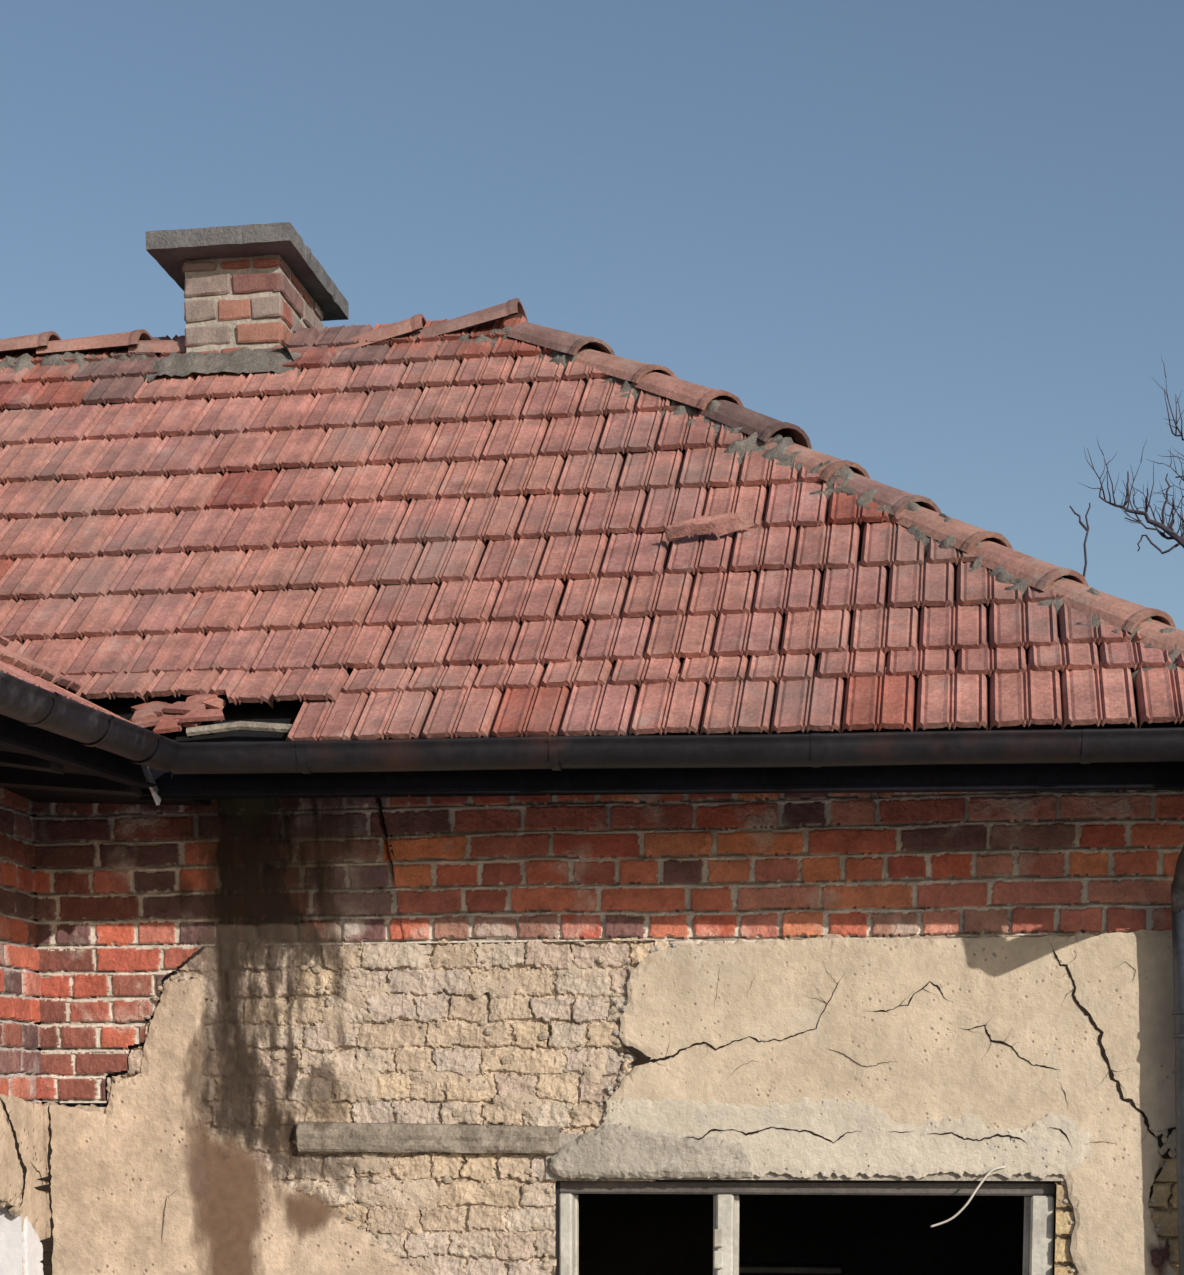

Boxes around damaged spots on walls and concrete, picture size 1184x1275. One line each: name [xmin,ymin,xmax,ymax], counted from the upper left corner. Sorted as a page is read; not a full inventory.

crack [0,1098,54,1275]
spalling [80,1015,152,1114]
water stain [191,797,325,1275]
water stain [286,1192,332,1233]
spalling [151,936,677,1275]
crack [622,963,899,1080]
crack [688,945,1165,1205]
spalling [1148,1127,1179,1275]